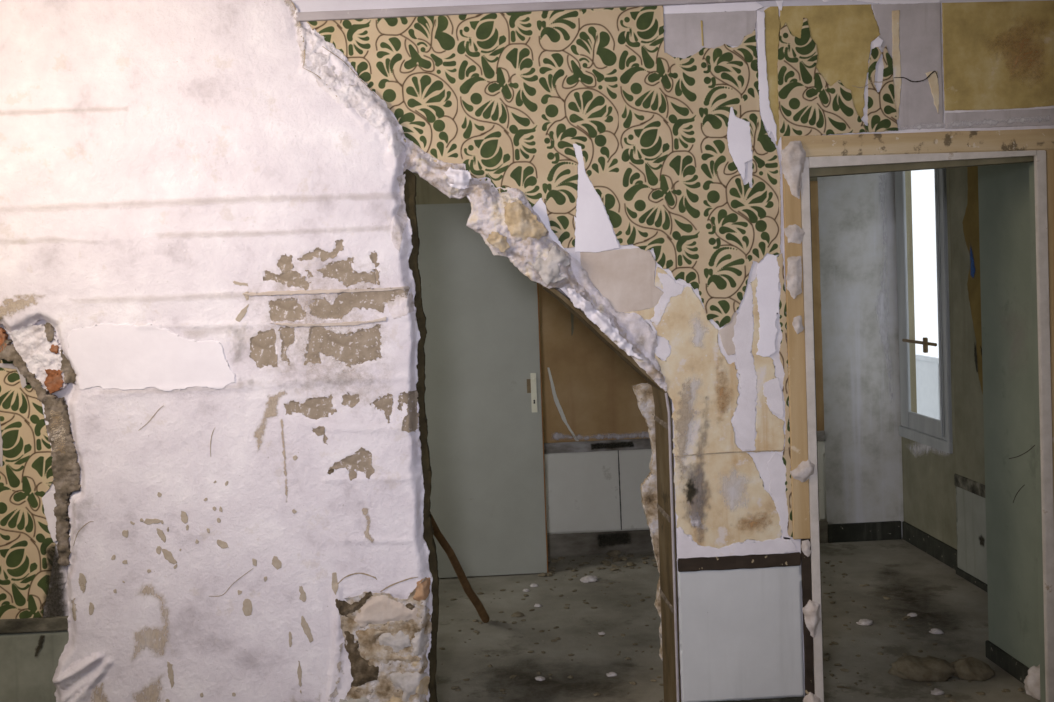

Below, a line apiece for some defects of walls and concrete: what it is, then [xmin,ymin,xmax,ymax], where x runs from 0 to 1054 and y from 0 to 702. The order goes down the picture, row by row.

flaking render [249,239,414,369]
spalling [284,8,667,661]
spalling [0,322,94,615]
damp [676,382,706,525]
flaking render [165,662,174,702]
flaking render [238,590,252,616]
flaking render [264,556,282,582]
spalling [332,572,432,702]